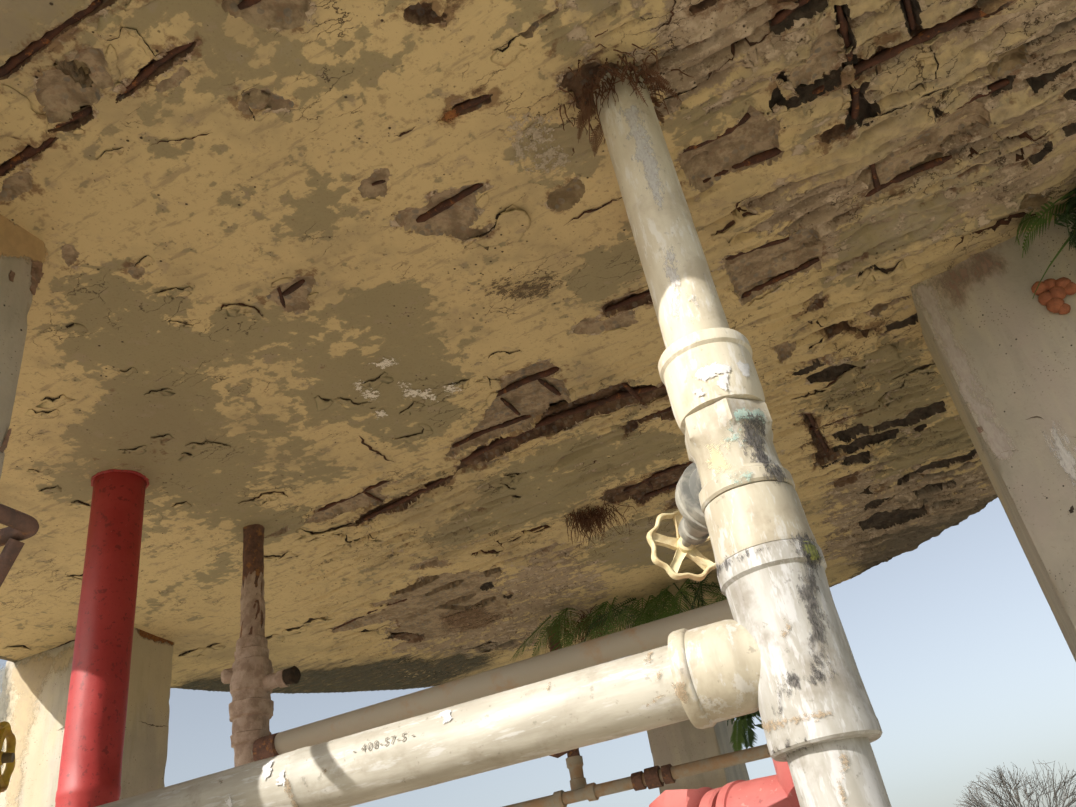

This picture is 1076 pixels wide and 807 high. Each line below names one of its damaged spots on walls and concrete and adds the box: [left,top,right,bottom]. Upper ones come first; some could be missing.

spalling [396,0,455,31]
spalling [0,0,205,206]
corrosion [437,109,460,123]
spalling [674,0,1018,194]
spalling [843,42,1076,209]
spalling [262,272,321,317]
spalling [719,213,827,307]
peeling [770,293,920,385]
spalling [264,358,675,538]
spalling [596,459,693,510]
spalling [799,399,978,532]